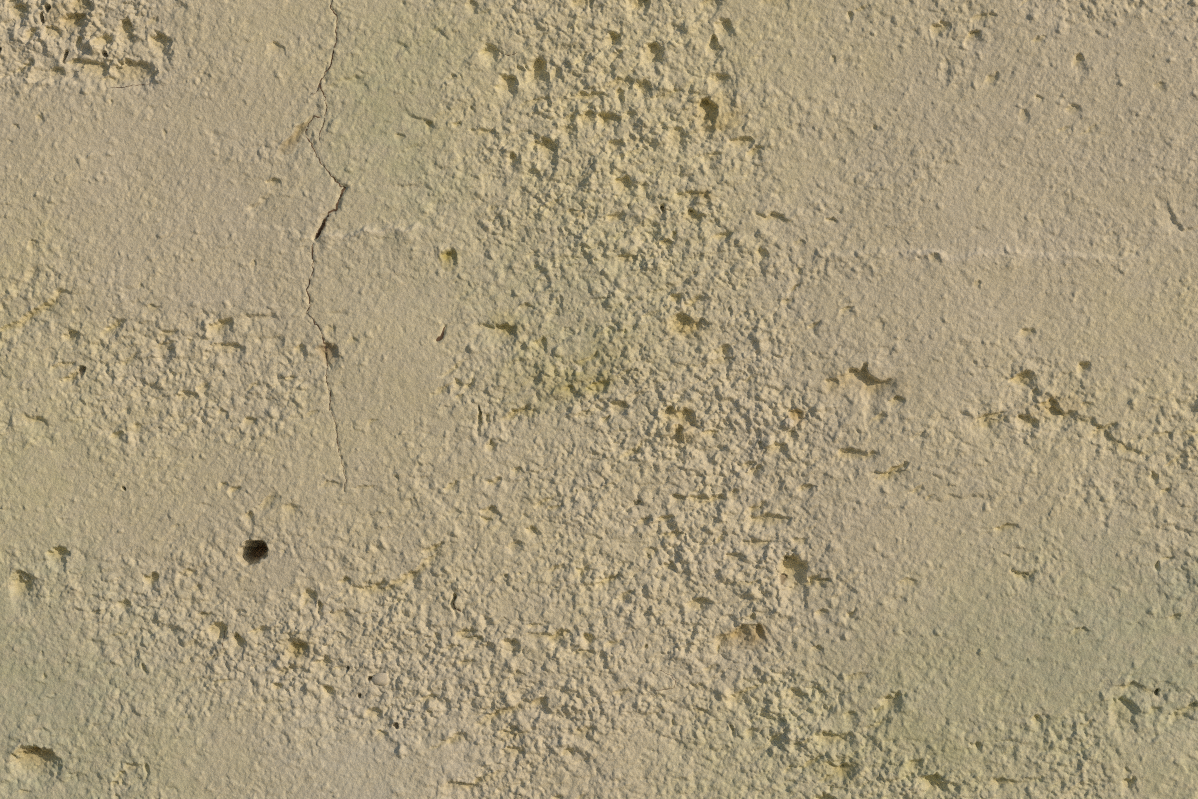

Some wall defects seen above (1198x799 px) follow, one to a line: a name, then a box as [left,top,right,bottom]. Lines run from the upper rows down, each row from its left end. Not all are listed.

crack [305,0,347,489]